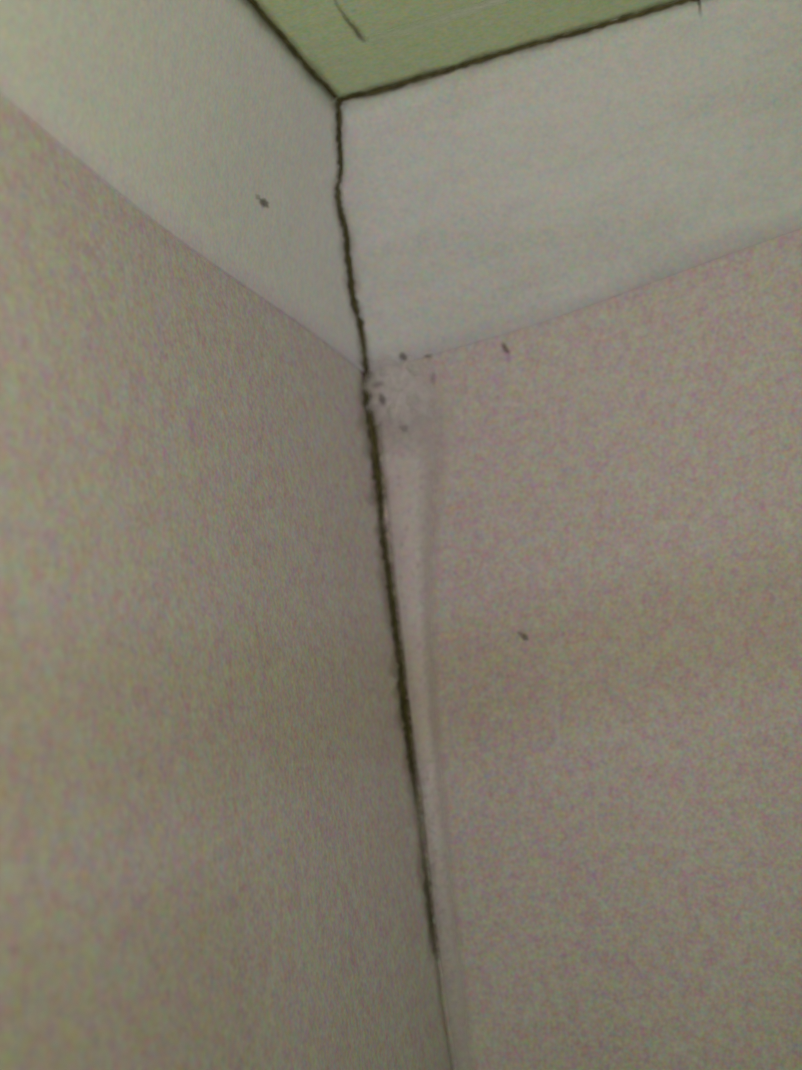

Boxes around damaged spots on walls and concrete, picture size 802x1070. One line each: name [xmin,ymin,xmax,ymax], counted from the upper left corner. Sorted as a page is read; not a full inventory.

crack [249,0,700,794]
crack [426,881,435,937]